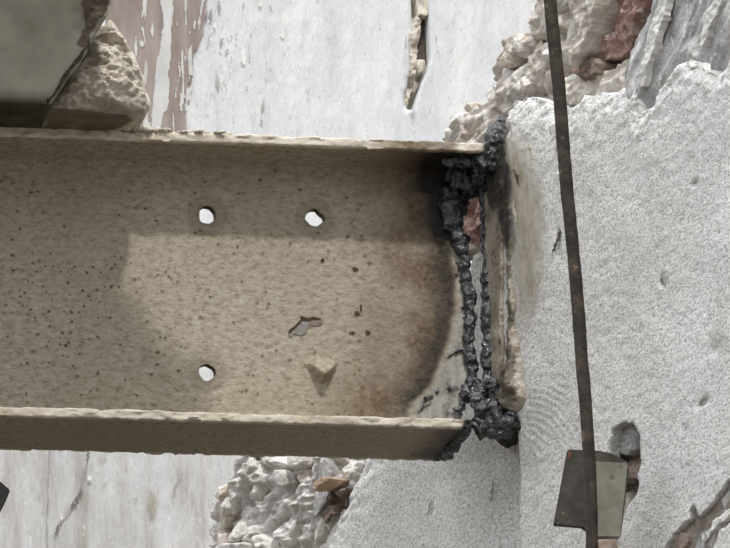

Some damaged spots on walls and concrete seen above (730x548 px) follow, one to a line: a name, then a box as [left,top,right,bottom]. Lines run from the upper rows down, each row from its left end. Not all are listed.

flaking render [443,0,553,144]
peeling [557,0,730,119]
flaking render [463,198,482,261]
peeling [288,316,323,337]
flaking render [209,455,369,548]
flaking render [672,491,730,548]